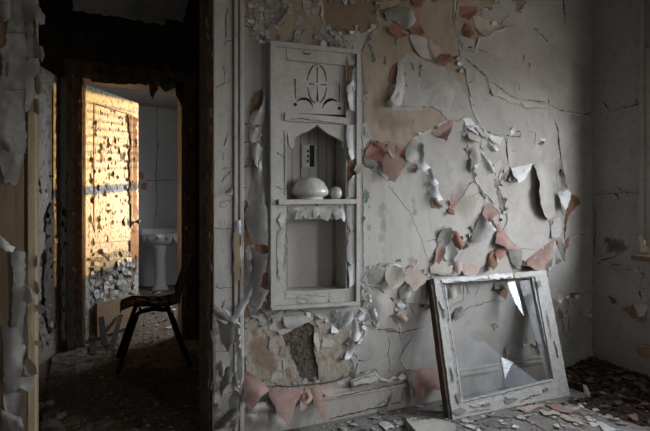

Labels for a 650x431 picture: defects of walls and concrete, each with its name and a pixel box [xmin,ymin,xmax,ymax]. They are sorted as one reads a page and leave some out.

peeling [0,0,45,186]
peeling [0,71,82,431]
peeling [89,64,194,304]
crack [262,304,427,419]
peeling [205,0,566,431]
crack [451,9,640,262]